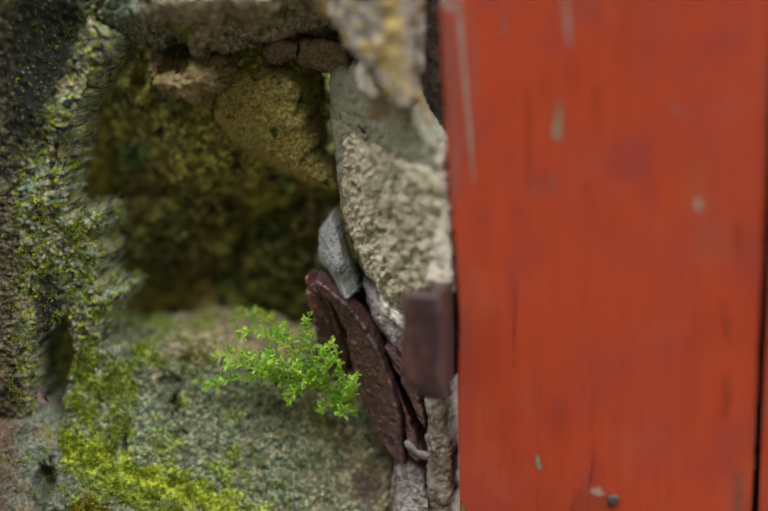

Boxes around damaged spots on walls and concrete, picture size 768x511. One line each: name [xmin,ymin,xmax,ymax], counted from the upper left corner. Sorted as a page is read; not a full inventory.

peeling [441,0,478,172]